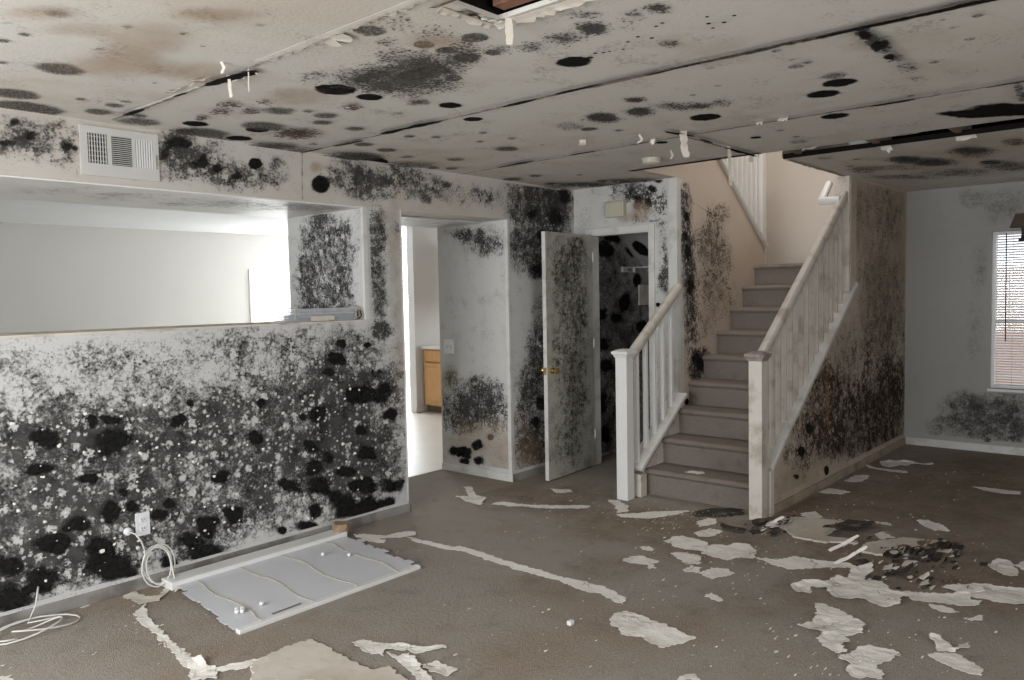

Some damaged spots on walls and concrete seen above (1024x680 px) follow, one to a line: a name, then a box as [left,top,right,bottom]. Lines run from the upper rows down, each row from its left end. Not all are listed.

spalling [459,0,542,15]
leakage [34,64,83,75]
leakage [315,84,383,100]
leakage [516,4,679,67]
leakage [558,94,733,131]
leakage [807,74,858,98]
leakage [854,28,918,80]
leakage [936,83,1024,118]
leakage [846,139,1024,180]
leakage [681,183,734,380]
leakage [0,89,668,613]
leakage [784,270,905,479]